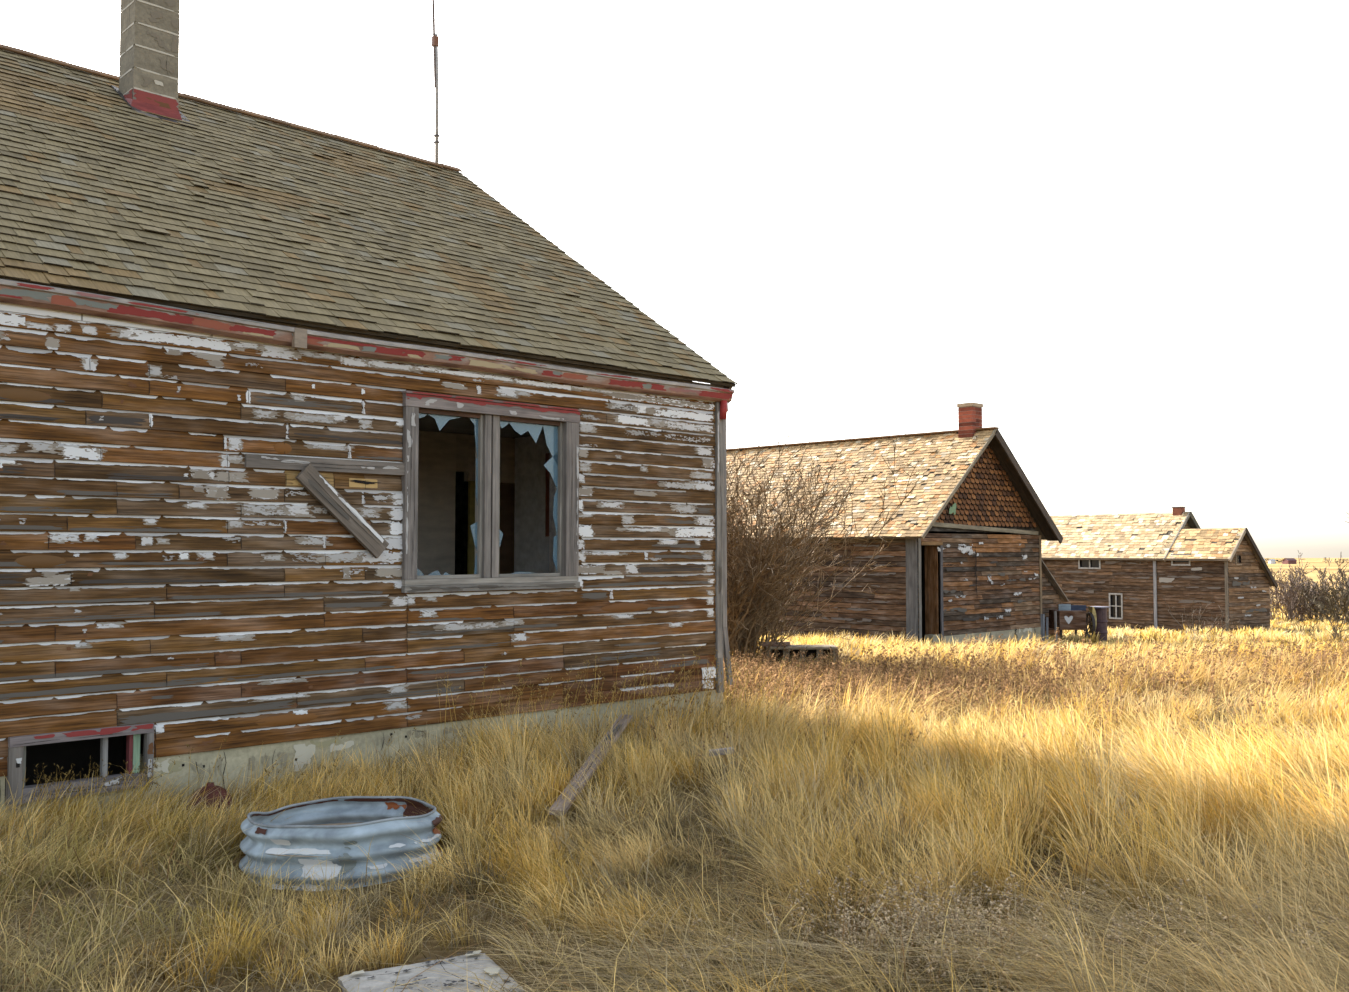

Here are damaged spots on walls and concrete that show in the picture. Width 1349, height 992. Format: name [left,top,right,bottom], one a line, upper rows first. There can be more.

peeling [0,283,734,617]
peeling [184,437,530,655]
peeling [248,677,310,715]
peeling [382,684,422,720]
peeling [701,666,716,690]
spalling [153,758,171,773]
spalling [293,741,354,772]